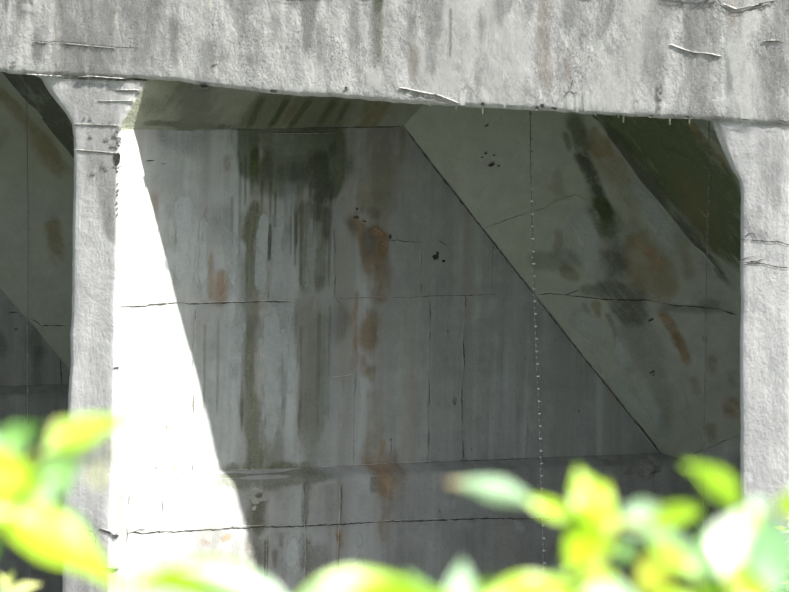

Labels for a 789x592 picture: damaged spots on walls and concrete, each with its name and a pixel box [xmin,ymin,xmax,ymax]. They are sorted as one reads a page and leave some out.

leakage [568,0,741,265]
crack [122,299,290,307]
leakage [241,201,272,284]
crack [260,126,735,453]
crack [741,233,789,268]
crack [90,517,553,542]